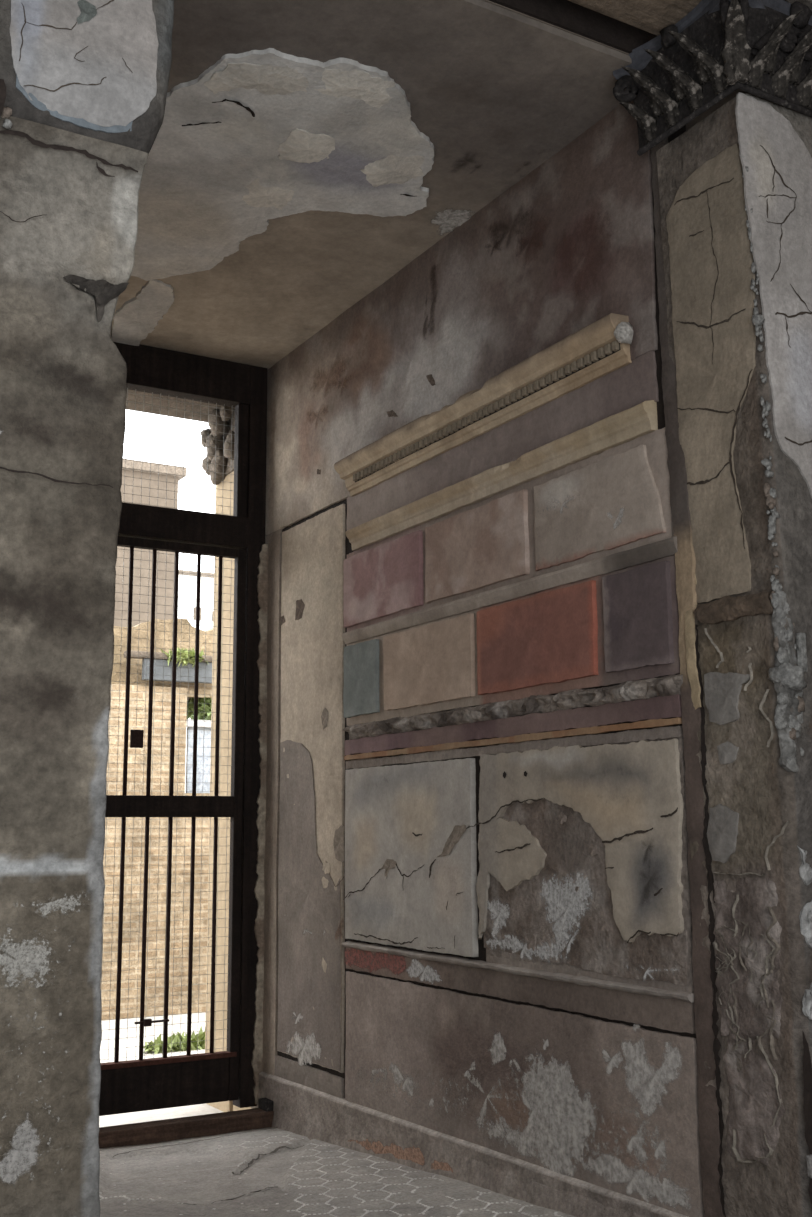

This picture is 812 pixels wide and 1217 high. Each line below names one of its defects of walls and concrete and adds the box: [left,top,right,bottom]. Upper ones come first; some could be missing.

crack [19,0,133,92]
flaking render [0,0,434,346]
crack [674,178,745,364]
crack [759,145,812,348]
crack [677,369,753,549]
leakage [0,928,71,1062]
leakage [21,894,89,916]
spalling [277,740,344,1071]
crack [343,832,436,900]
spalling [483,799,689,986]
spalling [707,804,790,1166]
flaking render [799,900,812,948]